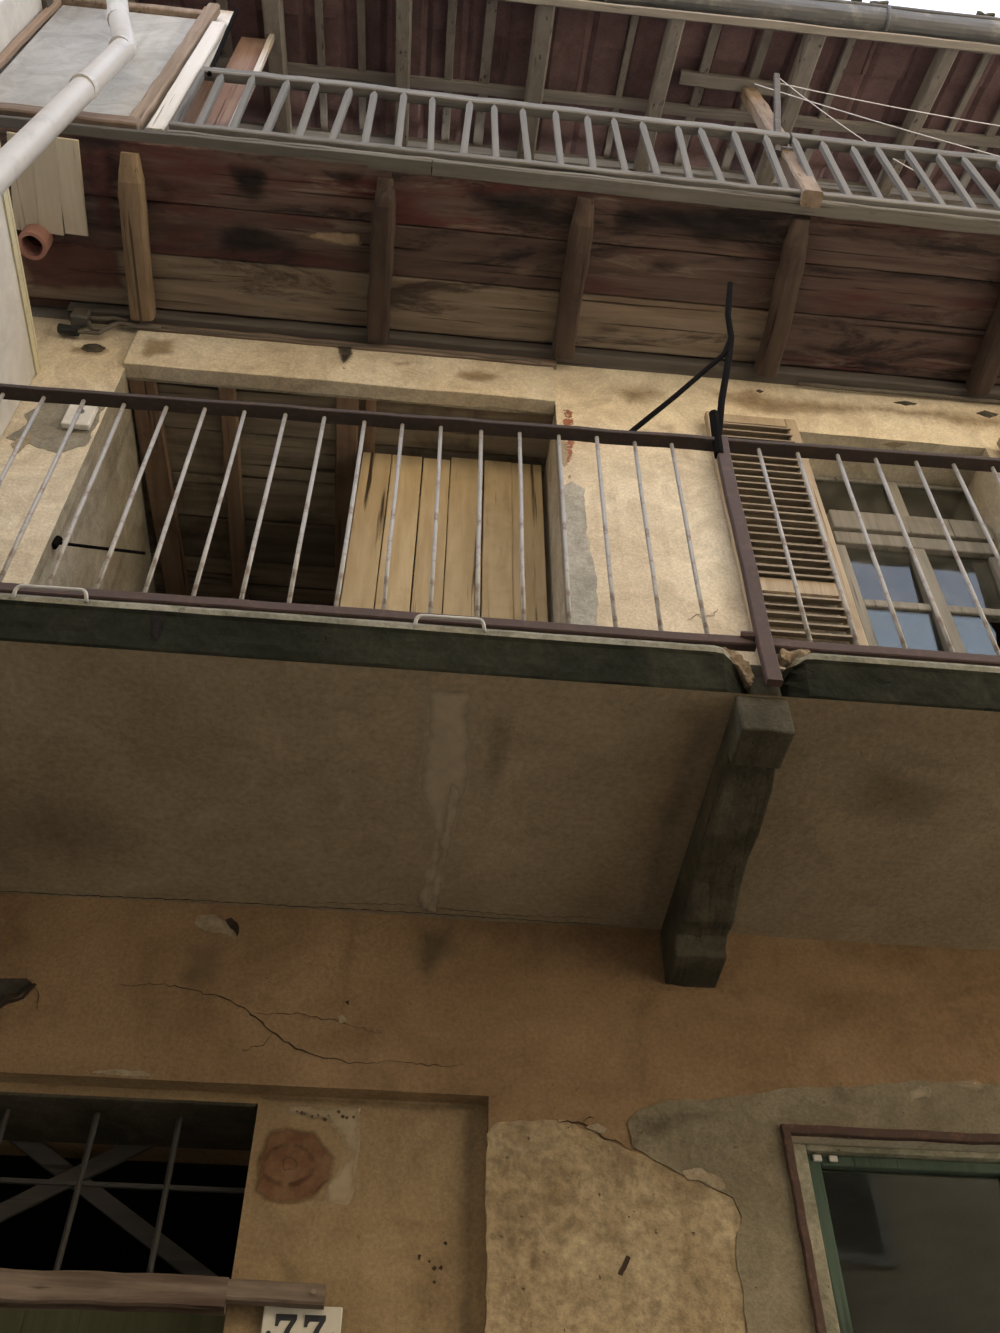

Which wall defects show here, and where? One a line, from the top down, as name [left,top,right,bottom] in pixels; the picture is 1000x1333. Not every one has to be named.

peeling [11,432,31,453]
spalling [723,647,782,696]
spalling [778,648,811,668]
damp [419,691,471,912]
crack [0,891,613,926]
crack [121,983,462,1067]
peeling [484,1120,746,1333]